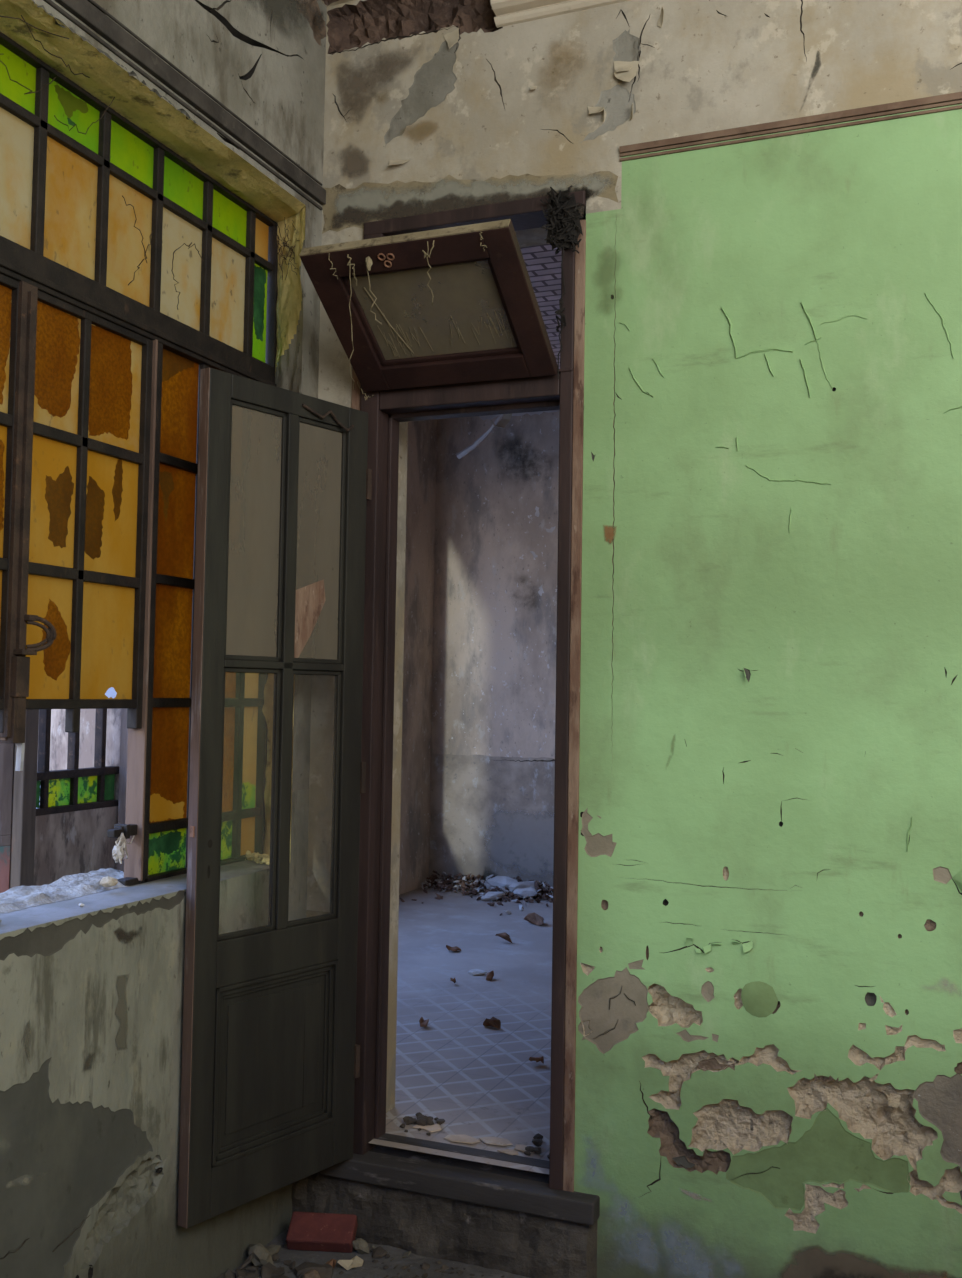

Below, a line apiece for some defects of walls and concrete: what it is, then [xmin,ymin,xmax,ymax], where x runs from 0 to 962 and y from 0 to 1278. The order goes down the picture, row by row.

crack [195,0,461,103]
damp [339,55,410,112]
crack [486,59,505,109]
peeling [541,6,664,143]
damp [343,147,368,177]
peeling [580,808,617,857]
spalling [0,868,128,914]
peeling [0,890,186,961]
peeling [578,937,962,1234]
damp [781,1246,955,1278]